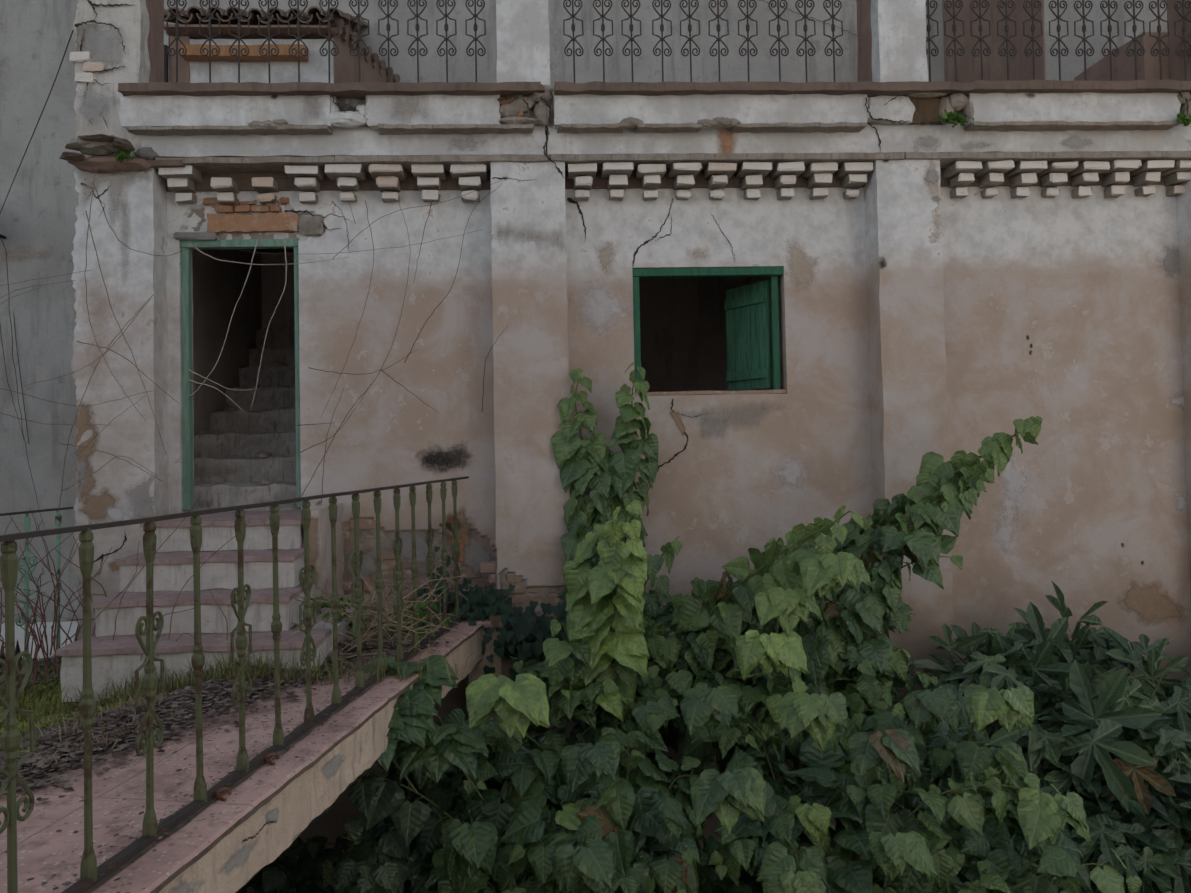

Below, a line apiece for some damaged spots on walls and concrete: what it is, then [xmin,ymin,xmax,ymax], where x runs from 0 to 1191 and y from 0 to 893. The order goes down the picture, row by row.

flaking render [69,24,120,120]
crack [492,94,586,241]
crack [865,95,911,151]
crack [632,198,673,268]
peeling [75,404,116,521]
peeling [130,478,156,519]
crack [648,399,709,490]
flaking render [341,518,566,629]